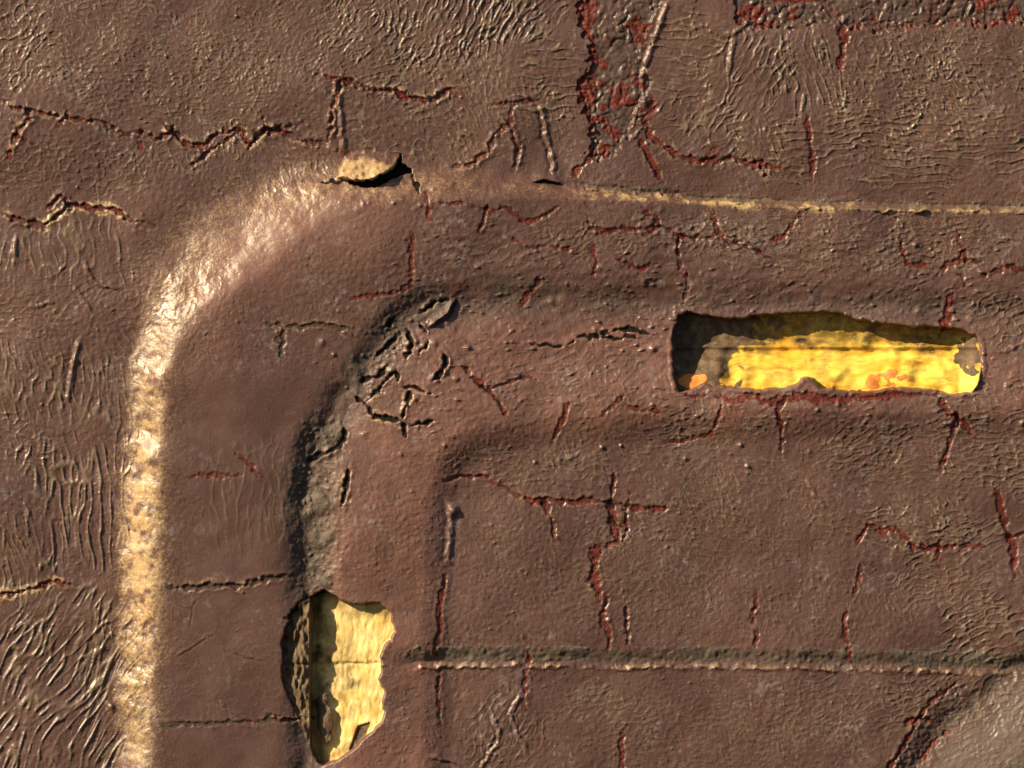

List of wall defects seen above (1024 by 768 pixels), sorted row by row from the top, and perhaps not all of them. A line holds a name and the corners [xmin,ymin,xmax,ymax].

crack [7,195,154,226]
crack [6,107,286,160]
peeling [321,152,420,194]
crack [312,73,459,155]
crack [639,108,817,184]
crack [347,190,801,451]
spalling [672,313,982,407]
crack [0,579,67,596]
crack [166,574,295,591]
crack [444,472,692,653]
crack [842,487,1024,663]
spalling [282,590,394,763]